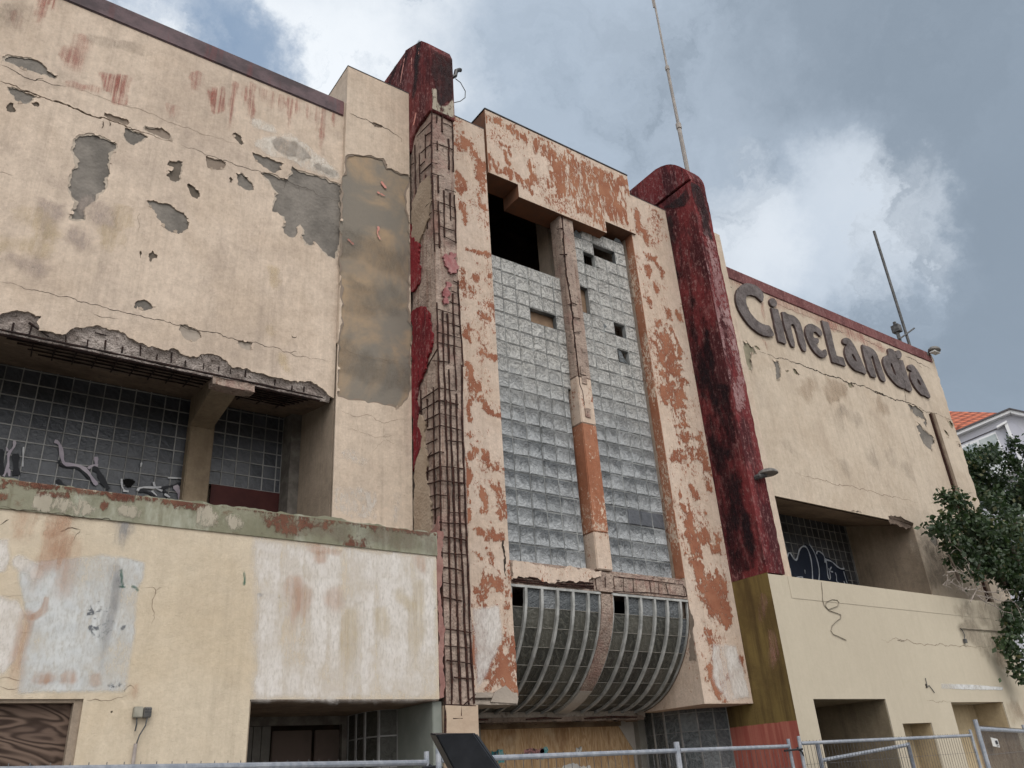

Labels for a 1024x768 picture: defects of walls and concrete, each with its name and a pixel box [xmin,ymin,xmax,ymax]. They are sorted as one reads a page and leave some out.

damp [389,41,420,97]
damp [432,52,453,105]
crack [5,66,338,201]
spalling [0,87,734,736]
damp [682,298,755,571]
crack [761,352,941,416]
rust [0,479,208,511]
rust [237,508,436,548]